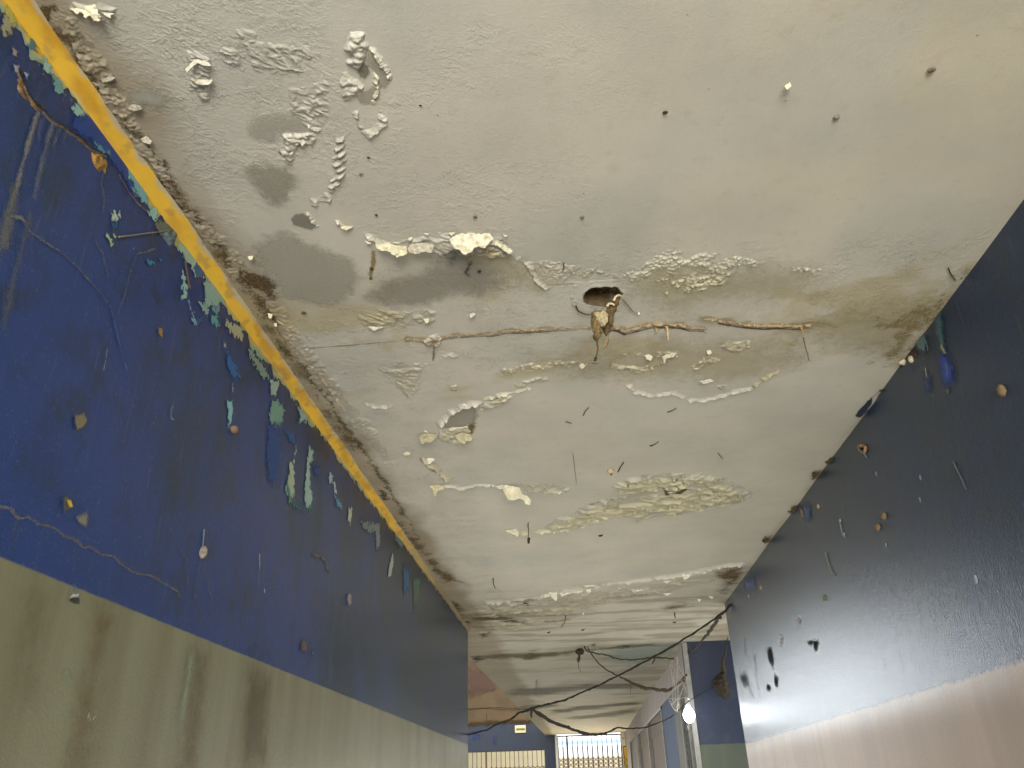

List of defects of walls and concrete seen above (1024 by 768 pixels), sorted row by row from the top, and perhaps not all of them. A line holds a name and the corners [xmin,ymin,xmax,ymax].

peeling [1,2,380,547]
peeling [335,220,551,290]
spalling [263,298,410,476]
peeling [419,387,532,445]
peeling [624,369,781,404]
leakage [690,340,752,373]
leakage [878,302,940,360]
peeling [429,483,571,505]
peeling [505,472,755,537]
crack [0,506,180,598]
peeling [388,538,420,605]